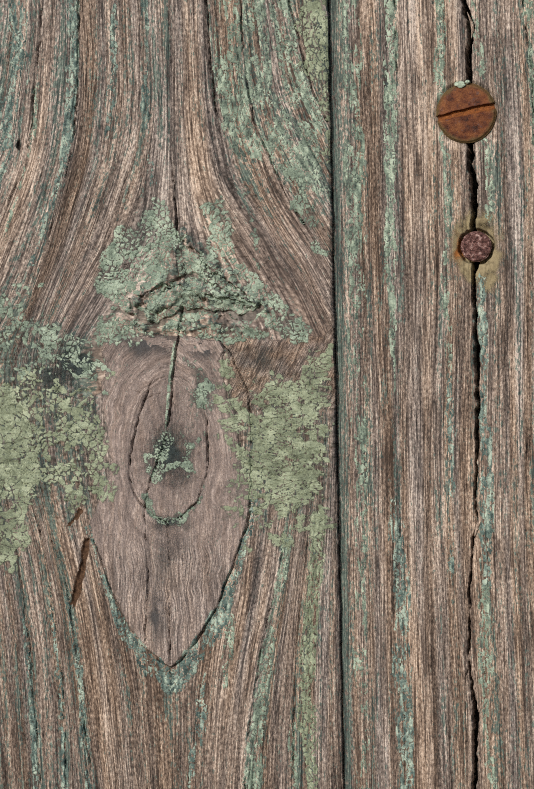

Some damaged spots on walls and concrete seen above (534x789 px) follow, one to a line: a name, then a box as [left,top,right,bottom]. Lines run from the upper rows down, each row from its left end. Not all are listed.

crack [464,0,475,83]
crack [470,143,479,231]
rust [452,213,501,291]
crack [473,262,481,453]
crack [129,339,180,540]
crack [169,516,250,679]
crack [465,672,479,789]